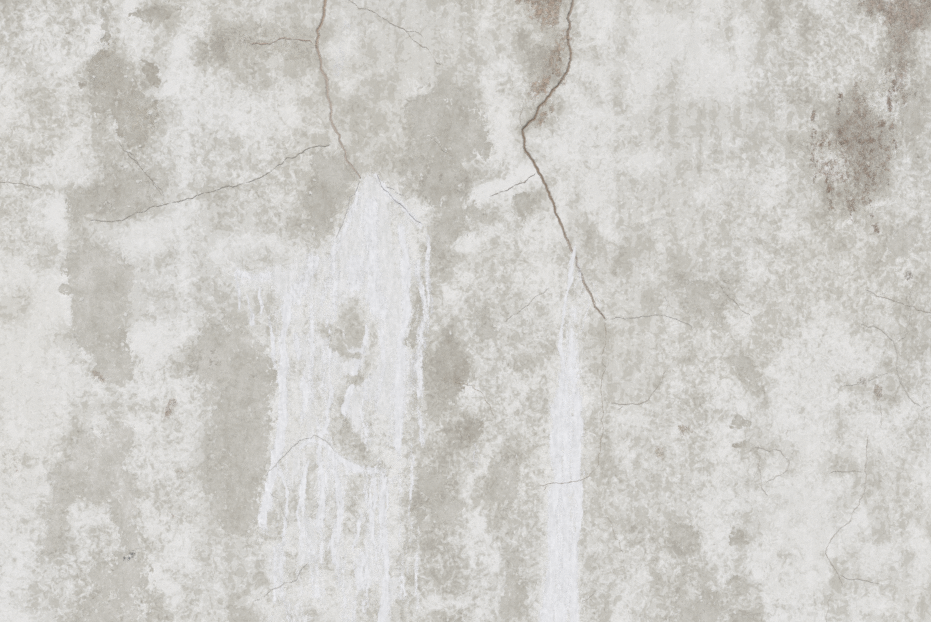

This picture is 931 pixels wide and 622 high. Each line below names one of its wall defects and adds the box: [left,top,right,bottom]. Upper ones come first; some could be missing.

crack [90,0,421,239]
crack [350,0,440,64]
rust [809,0,931,232]
crack [492,0,691,491]
water stain [234,172,434,622]
water stain [537,244,600,622]
crack [825,413,882,622]